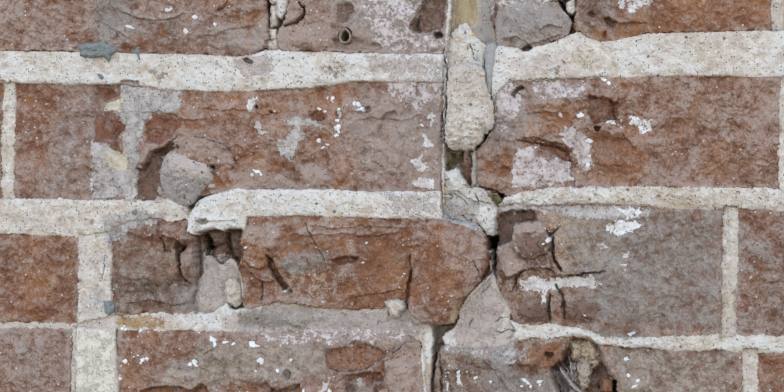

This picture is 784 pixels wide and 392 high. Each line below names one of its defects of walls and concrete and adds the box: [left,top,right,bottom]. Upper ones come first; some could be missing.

spalling [134,112,183,200]
spalling [208,229,244,261]
crack [508,220,602,321]
spalling [575,343,614,392]